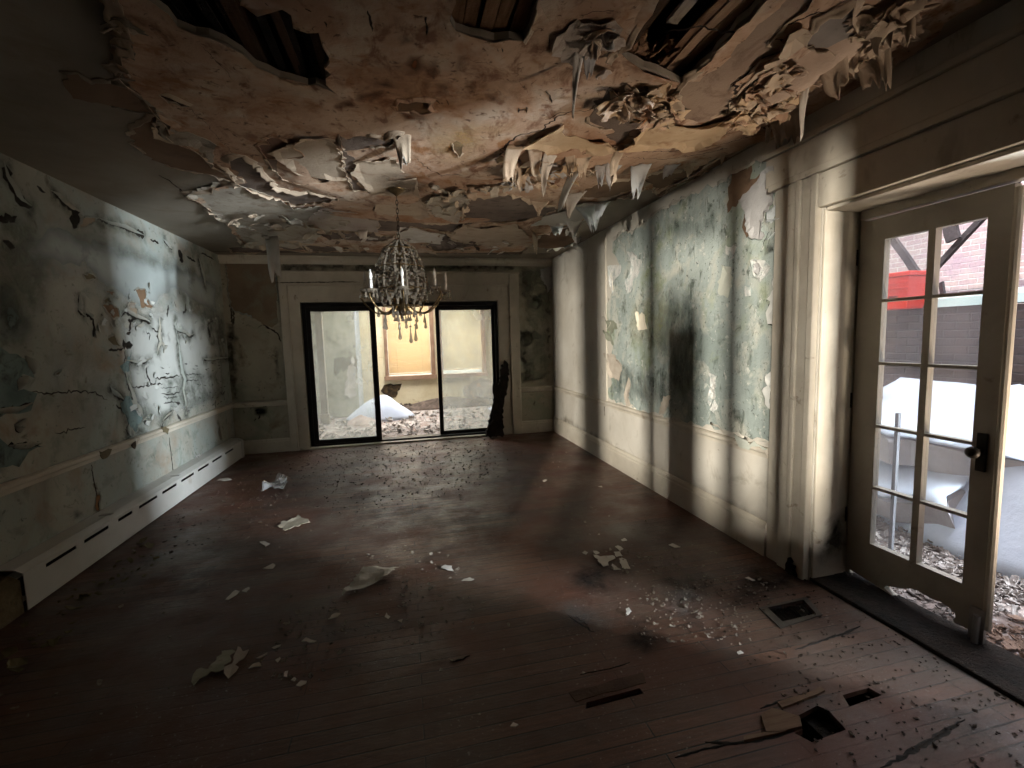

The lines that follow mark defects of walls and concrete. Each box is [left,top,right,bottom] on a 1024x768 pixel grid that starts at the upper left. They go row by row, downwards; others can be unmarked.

flaking render [99,0,982,351]
crack [0,160,235,470]
peeling [85,283,164,348]
peeling [0,347,42,468]
peeling [120,357,161,432]
peeling [603,319,631,406]
peeling [659,395,671,414]
peeling [708,371,718,413]
peeling [762,372,771,409]